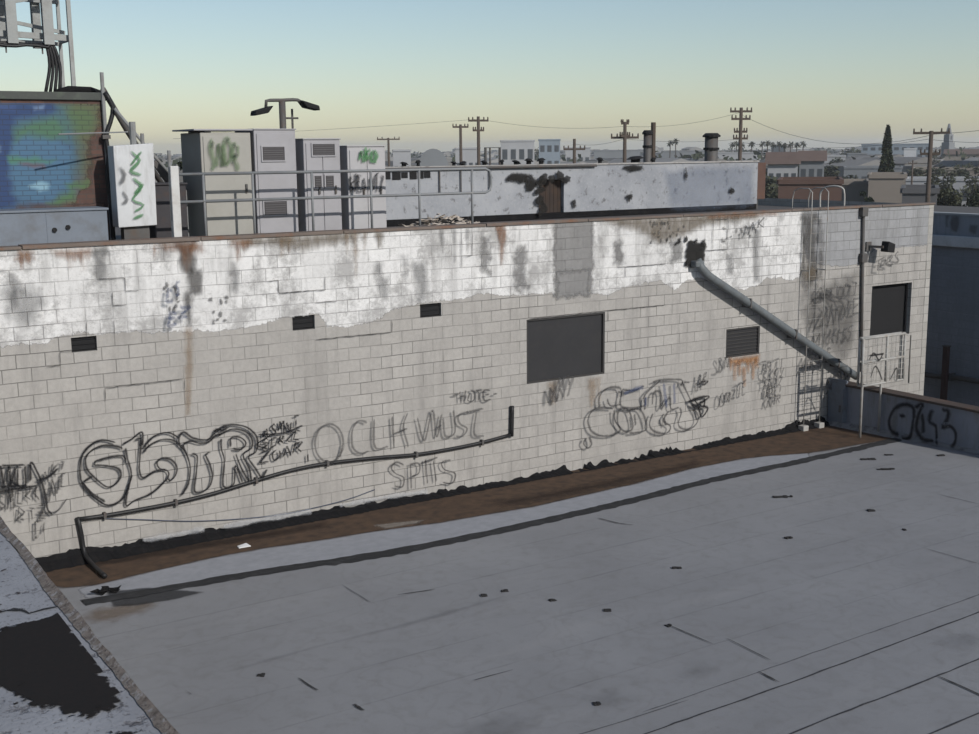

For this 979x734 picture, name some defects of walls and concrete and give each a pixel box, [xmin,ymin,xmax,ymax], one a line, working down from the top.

spalling [535,170,571,217]
peeling [480,238,492,274]
peeling [514,246,526,289]
peeling [553,221,594,299]
peeling [614,244,623,263]
spalling [650,221,707,268]
peeling [0,613,123,719]